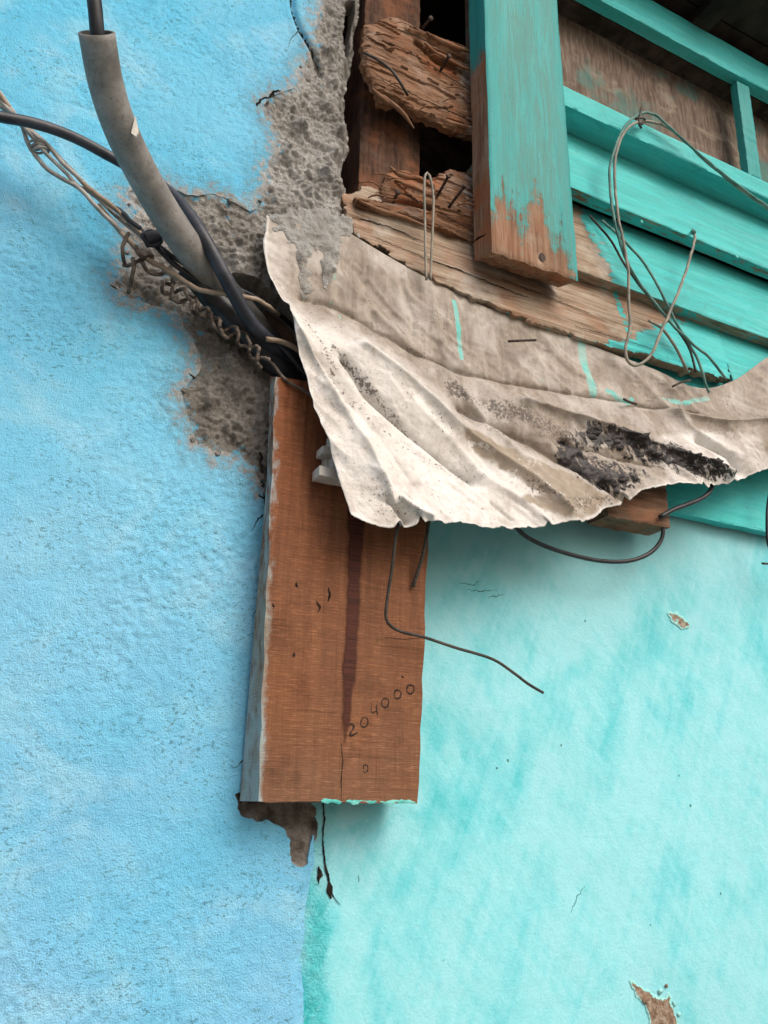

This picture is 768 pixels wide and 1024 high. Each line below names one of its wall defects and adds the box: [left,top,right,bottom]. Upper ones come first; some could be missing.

spalling [179,0,360,347]
spalling [110,190,272,501]
peeling [667,611,690,630]
spalling [235,792,318,867]
crack [317,803,339,903]
peeling [629,979,681,1024]